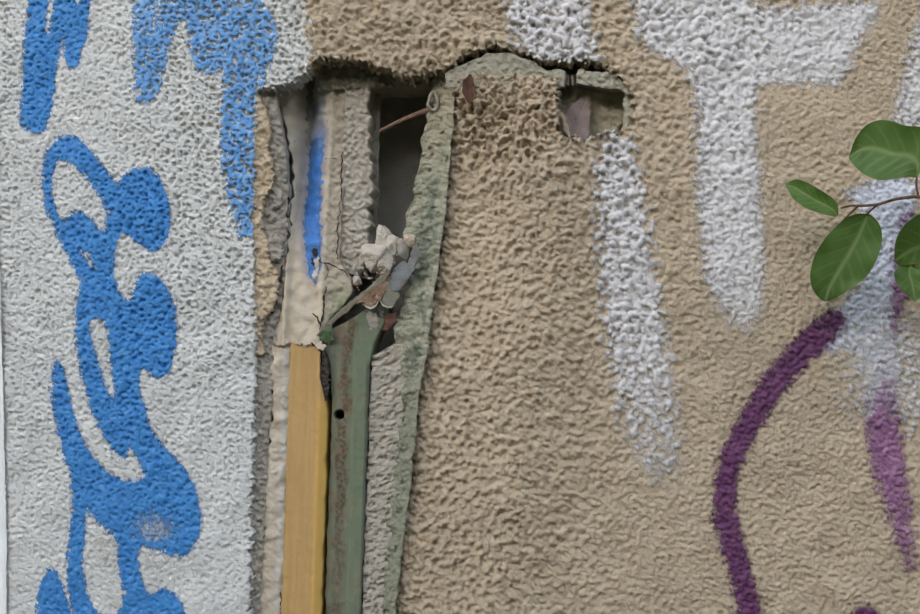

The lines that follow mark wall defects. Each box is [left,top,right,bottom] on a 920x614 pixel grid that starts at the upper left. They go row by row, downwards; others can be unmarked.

spalling [317,64,432,239]
spalling [558,68,635,143]
peeling [248,95,420,401]